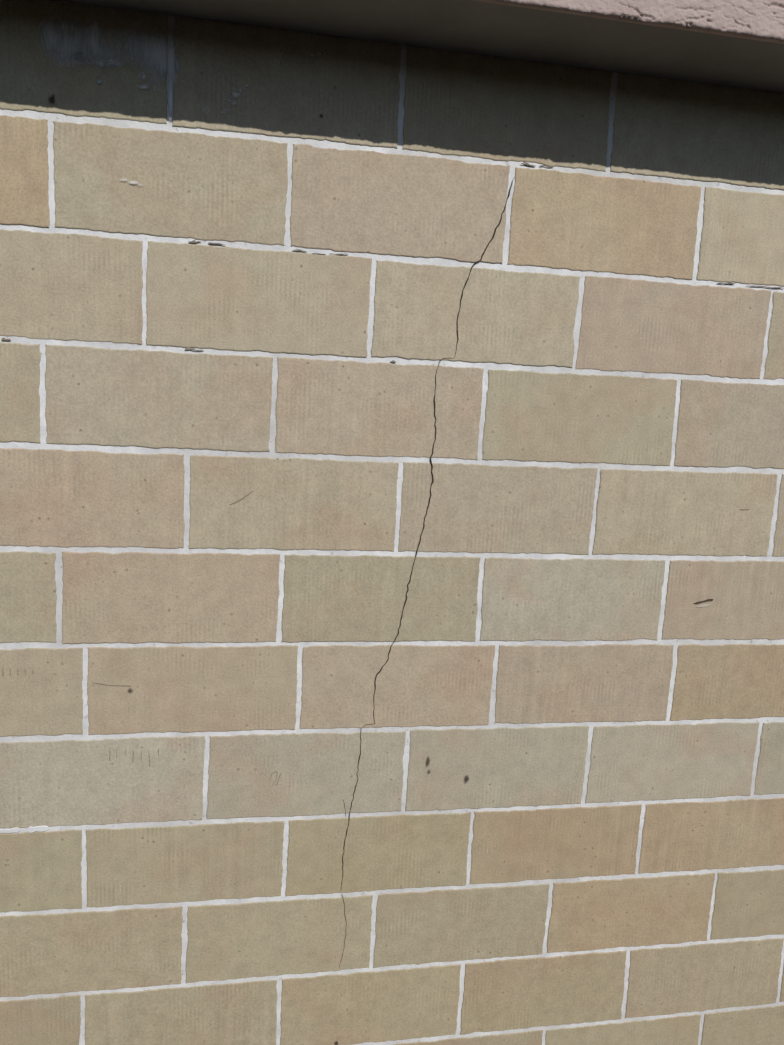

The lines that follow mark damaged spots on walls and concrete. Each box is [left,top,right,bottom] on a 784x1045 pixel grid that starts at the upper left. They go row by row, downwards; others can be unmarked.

crack [339,175,516,967]